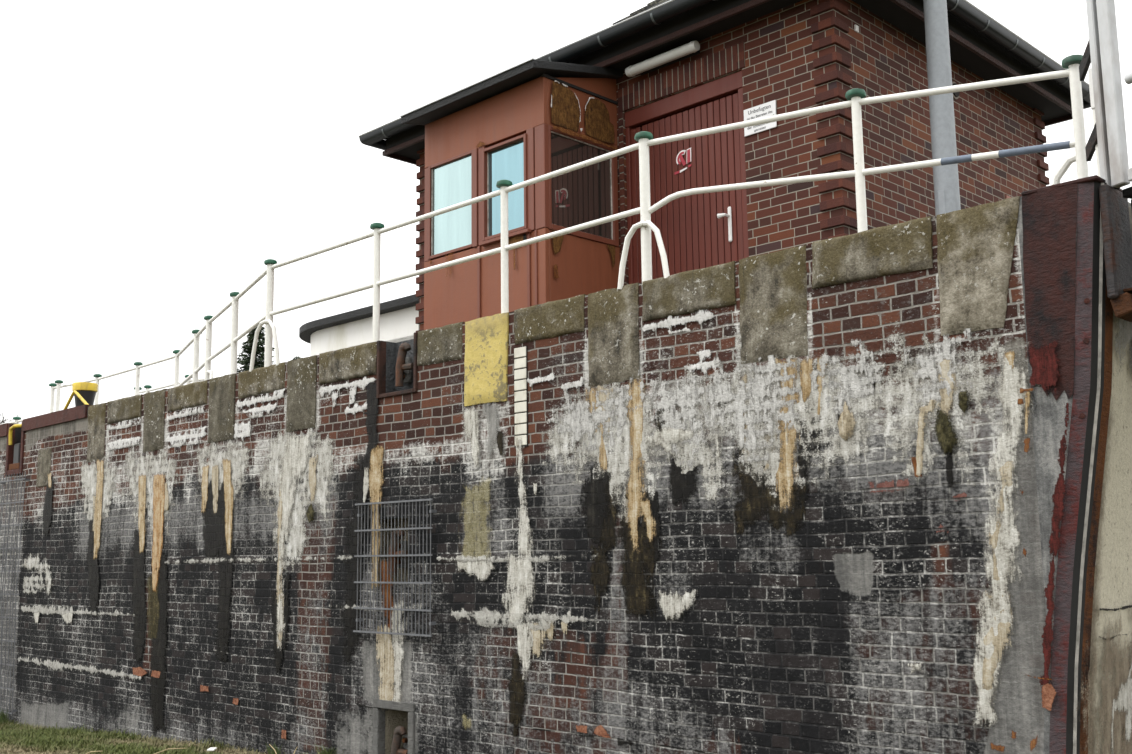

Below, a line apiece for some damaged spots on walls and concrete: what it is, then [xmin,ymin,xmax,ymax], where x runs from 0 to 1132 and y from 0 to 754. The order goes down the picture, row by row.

damp [642,310,714,335]
damp [903,328,979,405]
corrosion [1018,388,1033,452]
damp [21,554,53,595]
damp [43,473,53,536]
damp [87,520,99,616]
damp [201,479,235,663]
damp [271,432,318,674]
damp [451,339,889,738]
damp [973,351,1030,725]
damp [132,528,168,735]